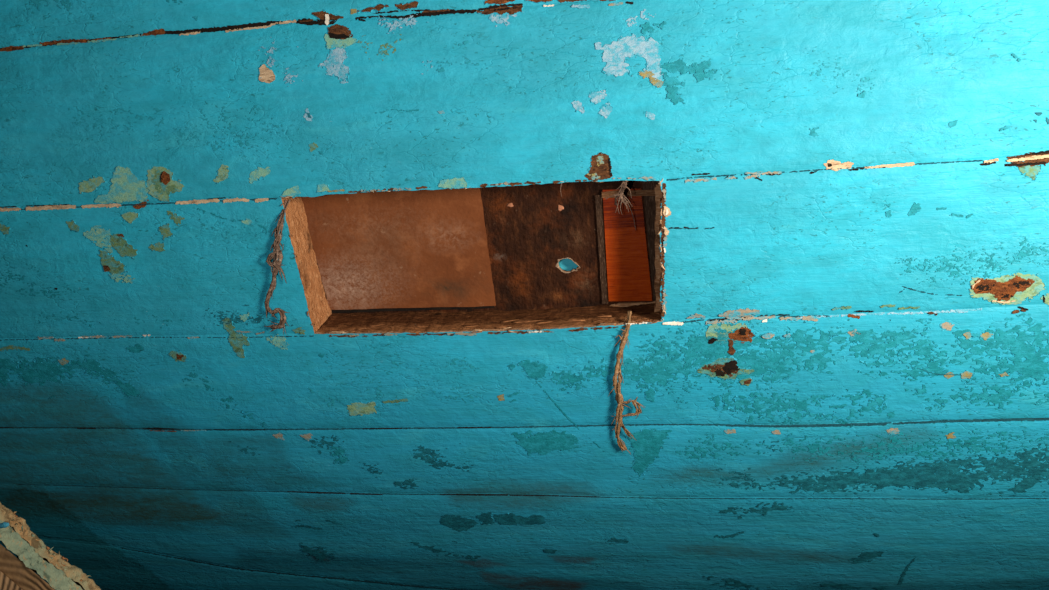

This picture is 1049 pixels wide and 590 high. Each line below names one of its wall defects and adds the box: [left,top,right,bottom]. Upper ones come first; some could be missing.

peeling [258,39,303,84]
peeling [571,9,718,118]
peeling [69,100,299,184]
peeling [66,166,185,284]
peeling [34,304,313,358]
peeling [329,329,549,338]
peeling [508,154,1049,539]
peeling [848,551,884,563]